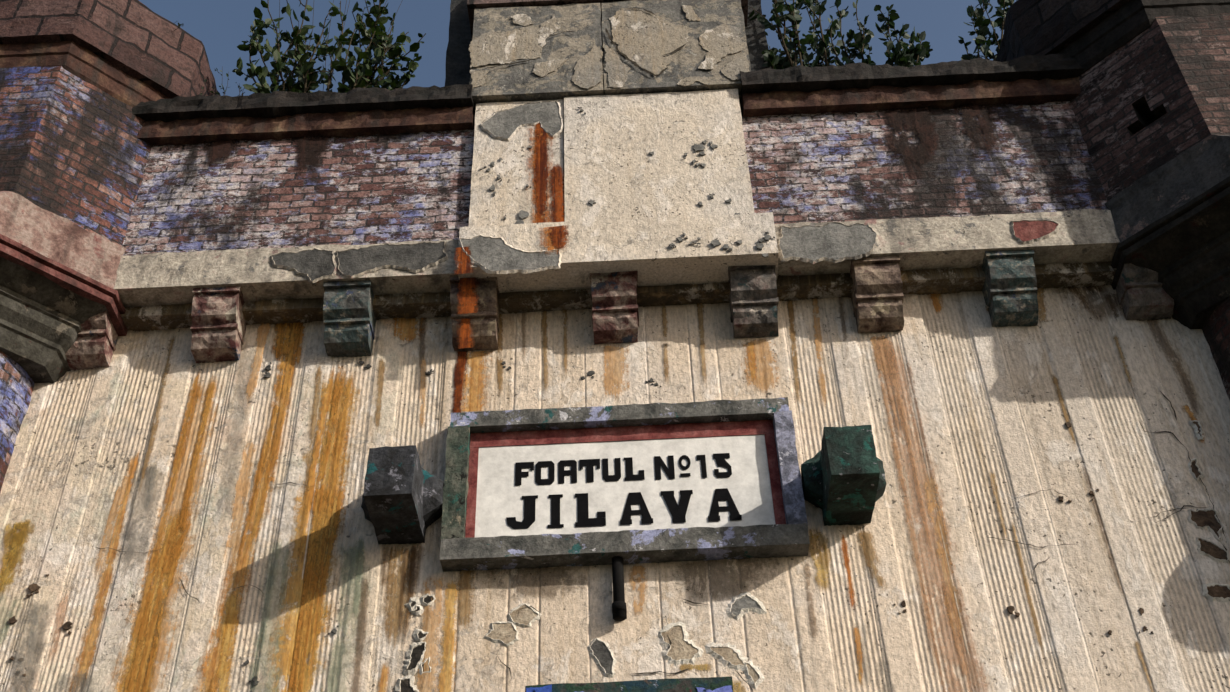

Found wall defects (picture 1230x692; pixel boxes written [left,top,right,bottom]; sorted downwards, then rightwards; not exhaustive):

peeling [469,5,750,89]
spalling [270,234,562,283]
rust [453,247,488,413]
rust [528,123,569,254]
spalling [669,221,879,264]
damp [70,337,174,692]
damp [113,373,218,692]
damp [201,323,302,692]
damp [268,366,360,692]
crack [988,537,1074,574]
crack [1139,391,1230,601]
spalling [587,638,616,678]